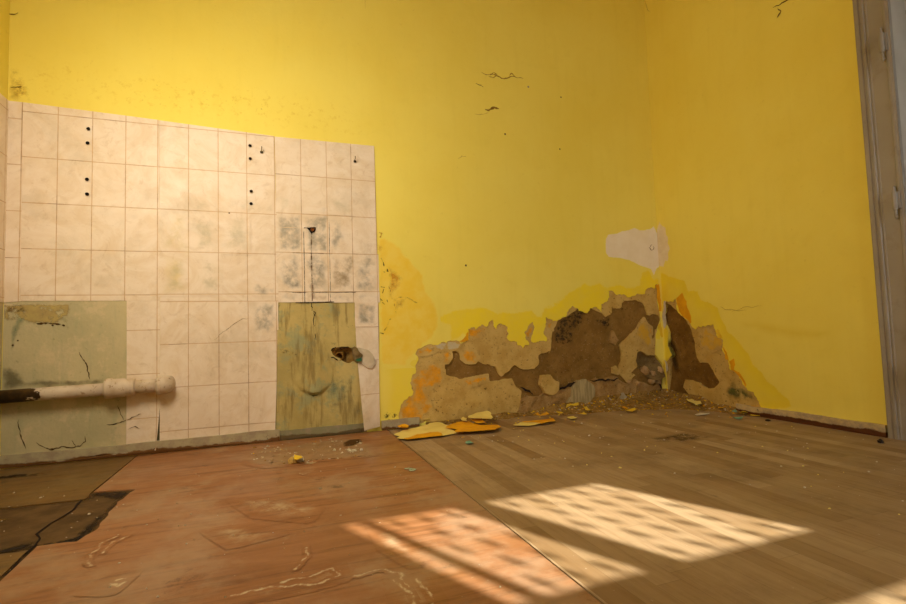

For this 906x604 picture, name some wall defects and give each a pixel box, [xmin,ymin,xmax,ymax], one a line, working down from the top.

peeling [399,219,761,444]